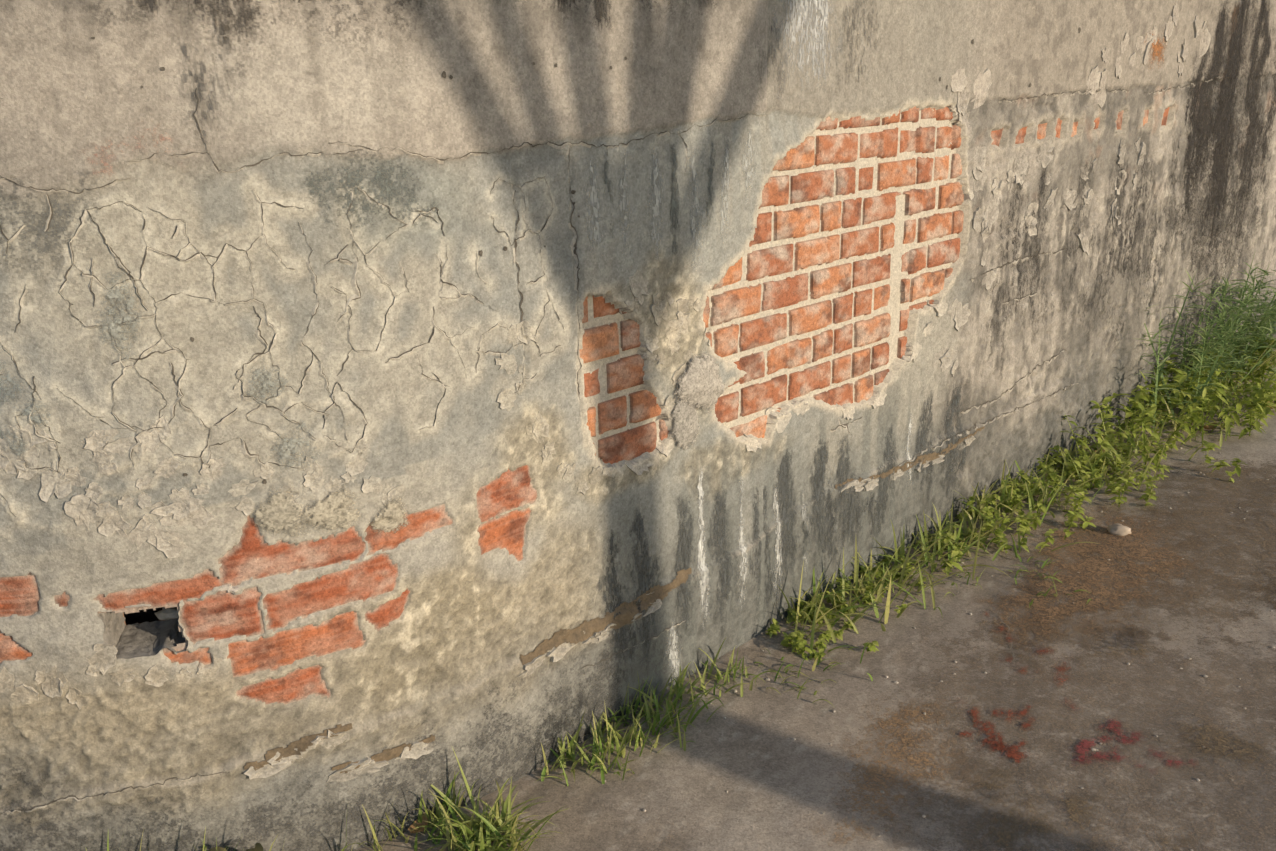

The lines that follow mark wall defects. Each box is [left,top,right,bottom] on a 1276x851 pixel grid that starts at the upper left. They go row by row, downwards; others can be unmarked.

crack [0,87,766,473]
leakage [594,0,610,23]
flaking render [476,68,1097,561]
leakage [990,167,1092,334]
peeling [1086,0,1211,129]
leakage [1084,0,1276,317]
flaking render [0,572,89,709]
peeling [0,415,227,558]
flaking render [86,439,453,705]
leakage [0,514,659,851]
spalling [516,568,692,678]
leakage [666,385,966,674]